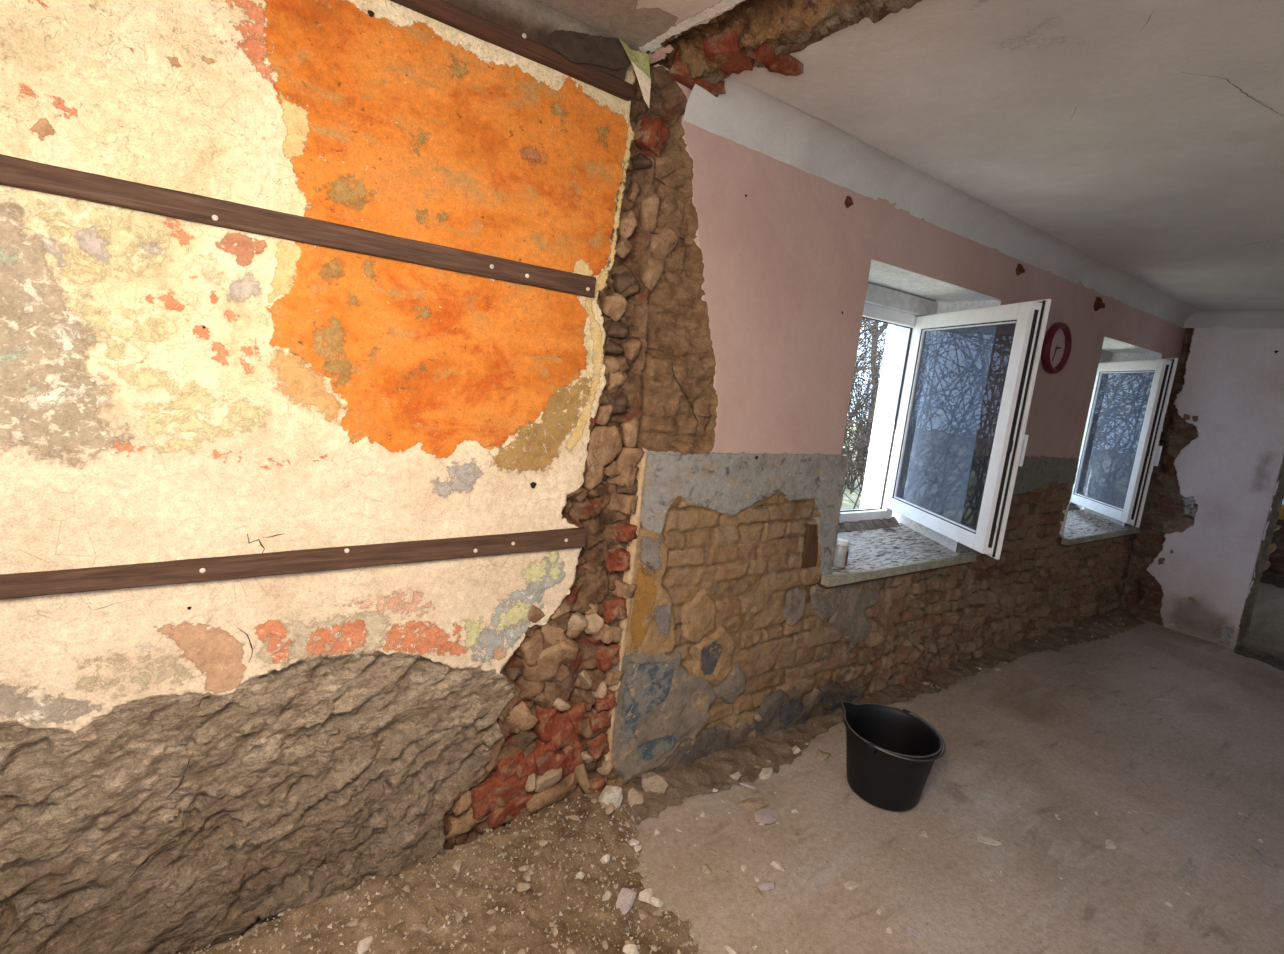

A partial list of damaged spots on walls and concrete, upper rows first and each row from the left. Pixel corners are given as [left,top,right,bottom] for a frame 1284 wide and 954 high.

spalling [0,550,566,954]
peeling [0,0,745,473]
spalling [598,768,669,810]
flaking render [637,112,1198,738]
flaking render [1262,519,1284,582]